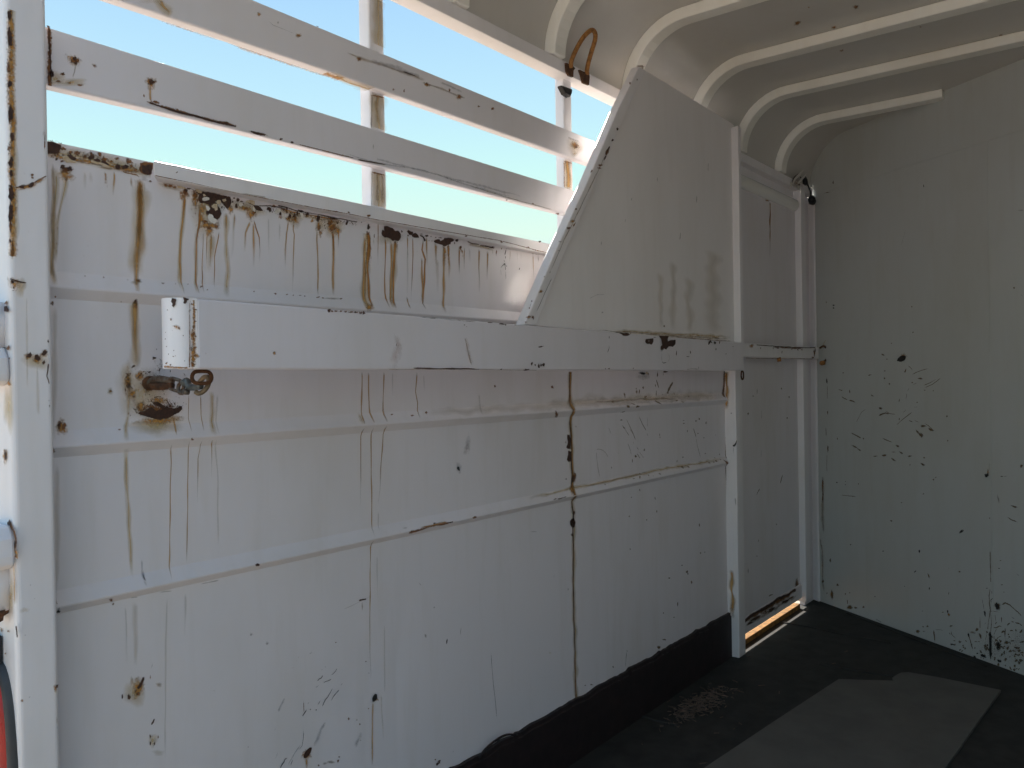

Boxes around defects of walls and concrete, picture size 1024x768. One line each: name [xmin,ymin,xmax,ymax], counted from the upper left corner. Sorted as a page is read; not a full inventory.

rust [6,10,17,257]
rust [47,25,82,86]
rust [143,78,236,127]
rust [47,138,557,323]
peeling [381,226,458,307]
rust [125,300,213,457]
rust [360,375,393,525]
peeling [645,325,691,363]